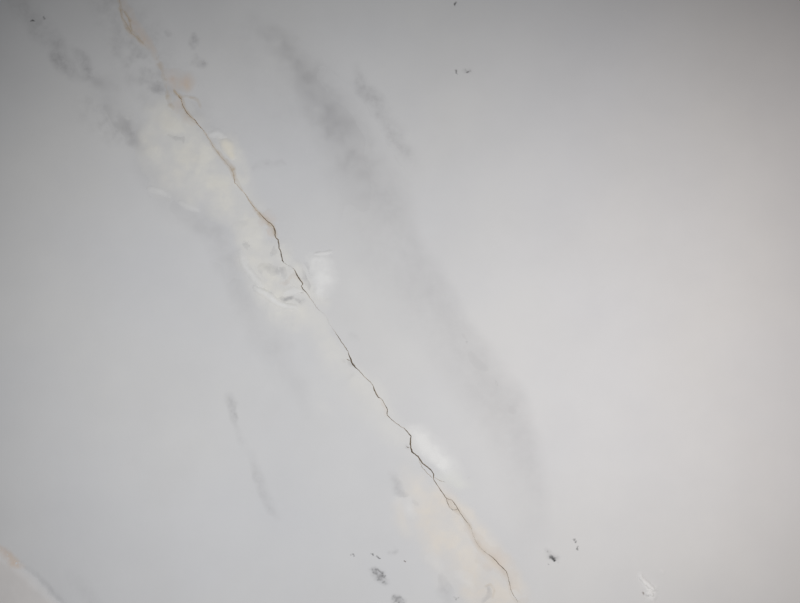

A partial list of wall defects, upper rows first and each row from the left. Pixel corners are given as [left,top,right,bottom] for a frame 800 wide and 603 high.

crack [174,91,319,310]
leakage [0,0,562,565]
leakage [367,545,408,603]
crack [332,328,517,600]